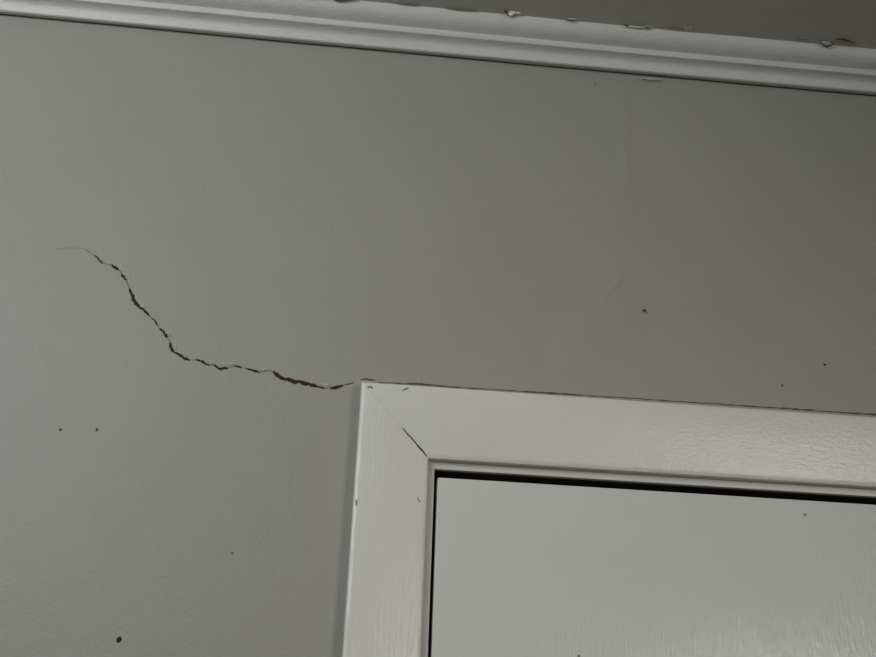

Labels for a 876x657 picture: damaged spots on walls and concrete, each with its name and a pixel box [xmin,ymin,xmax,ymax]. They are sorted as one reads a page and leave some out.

crack [85,249,876,457]